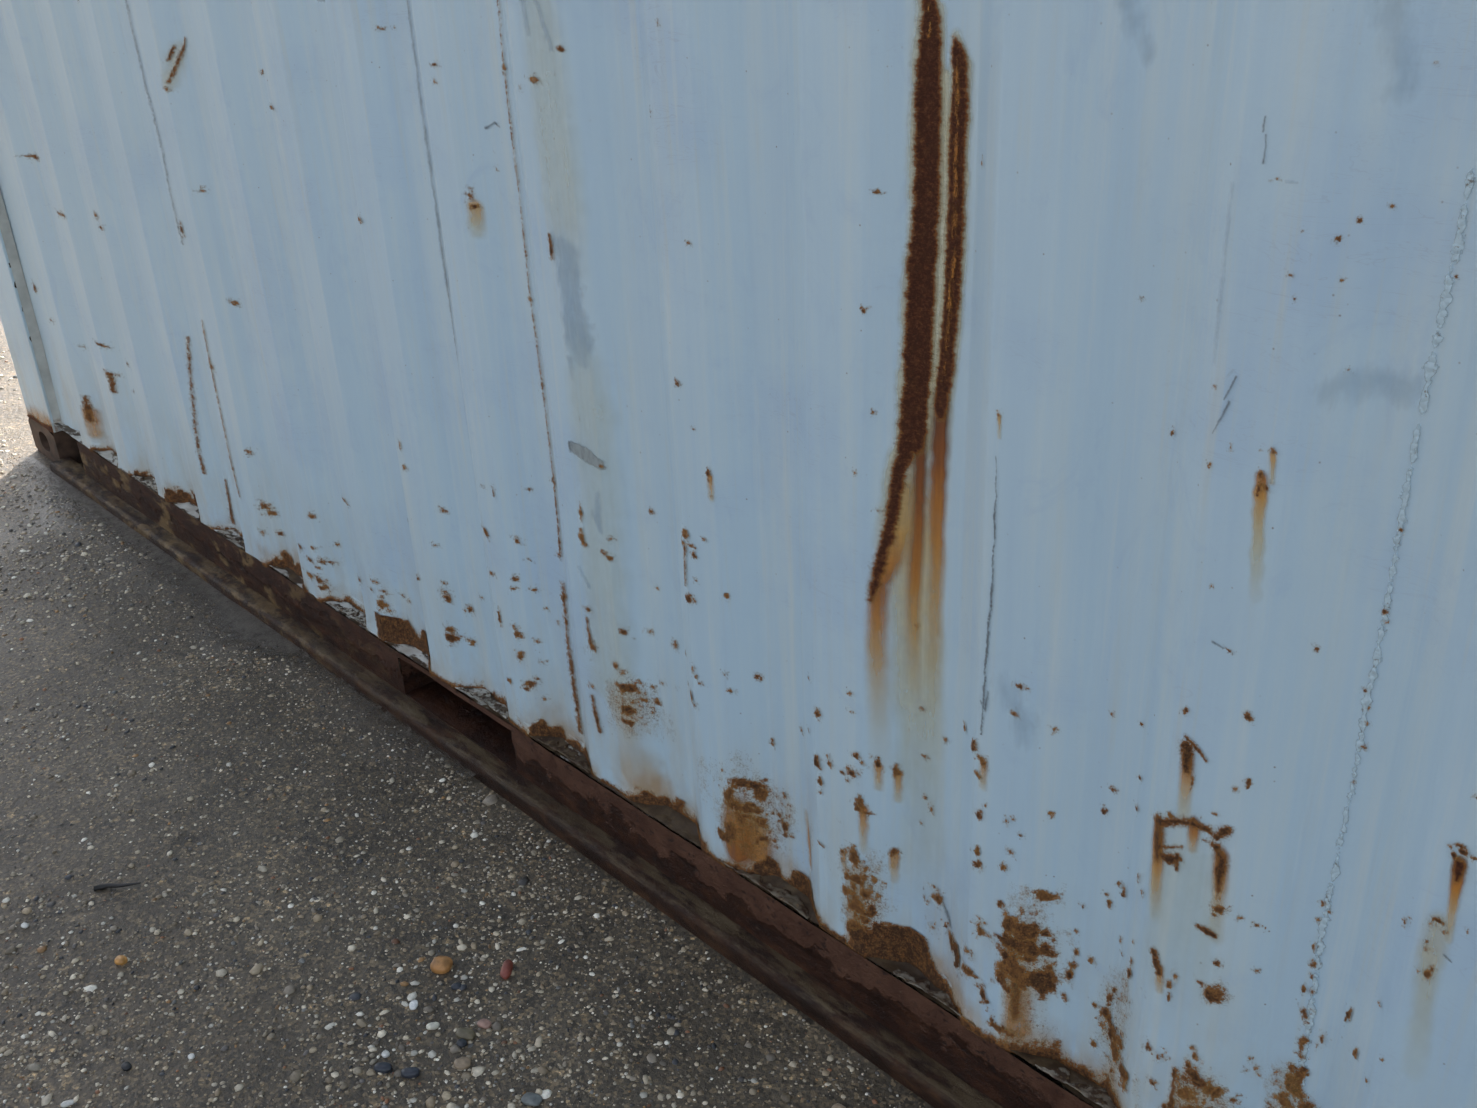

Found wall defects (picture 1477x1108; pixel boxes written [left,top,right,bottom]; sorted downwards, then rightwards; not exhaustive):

rust [867,0,982,681]
rust [1253,448,1277,545]
rust [82,395,1266,1108]
rust [1417,843,1477,981]
rust [1243,1008,1324,1108]